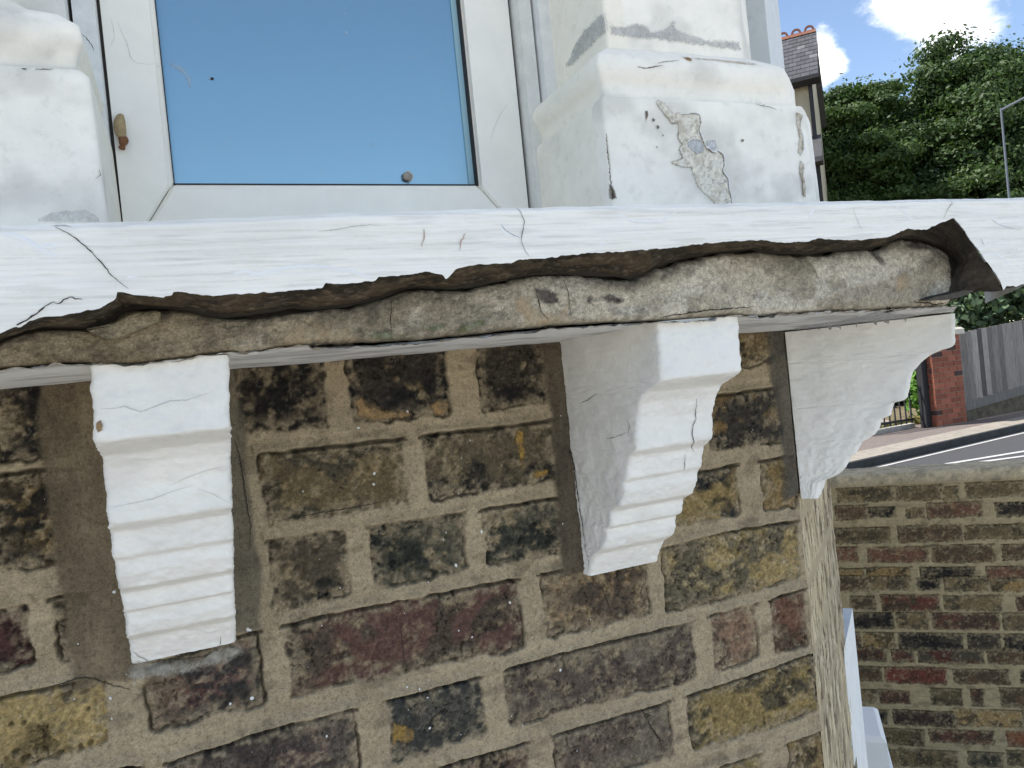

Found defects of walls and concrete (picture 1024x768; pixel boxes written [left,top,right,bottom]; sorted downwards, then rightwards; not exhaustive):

peeling [645,101,733,204]
peeling [796,113,806,197]
crack [0,208,950,343]
flaking render [0,218,1022,340]
crack [106,392,210,412]